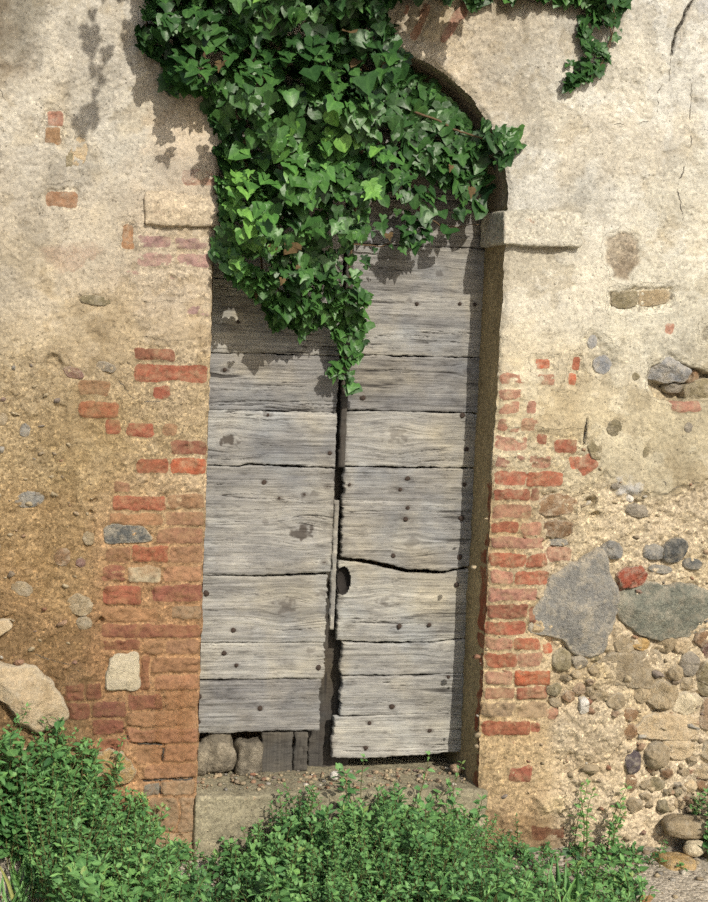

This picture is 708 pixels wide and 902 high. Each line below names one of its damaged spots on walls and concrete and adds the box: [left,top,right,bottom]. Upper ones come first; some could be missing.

crack [614,0,693,125]
spalling [529,324,619,393]
flaking render [632,356,708,399]
spalling [0,335,211,853]
spalling [478,419,708,849]